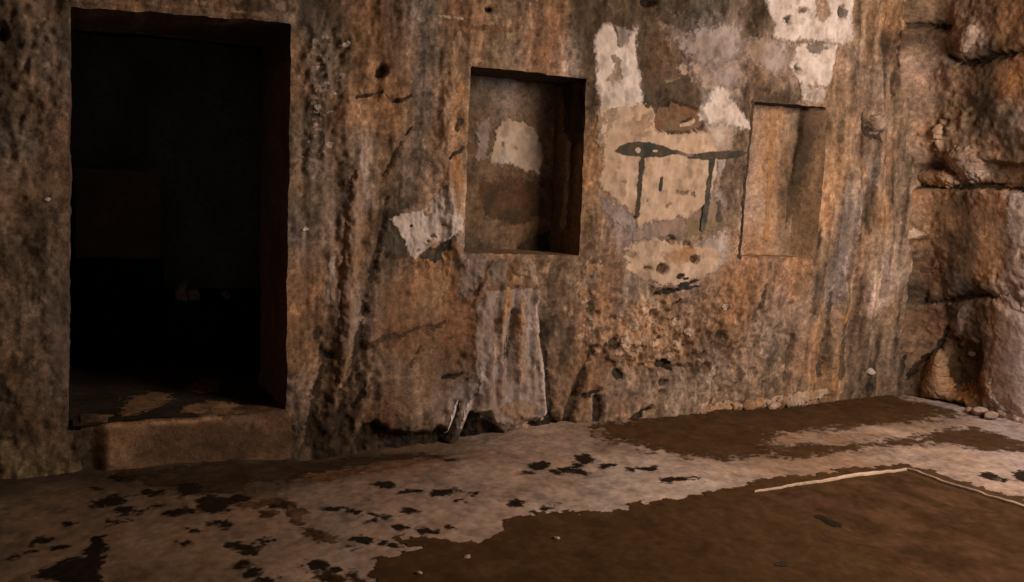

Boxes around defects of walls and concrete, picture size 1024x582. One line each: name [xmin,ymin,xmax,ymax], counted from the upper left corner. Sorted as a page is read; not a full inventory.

peeling [593,23,643,115]
peeling [766,0,854,103]
peeling [653,86,751,152]
peeling [390,184,463,259]
spalling [525,416,556,426]